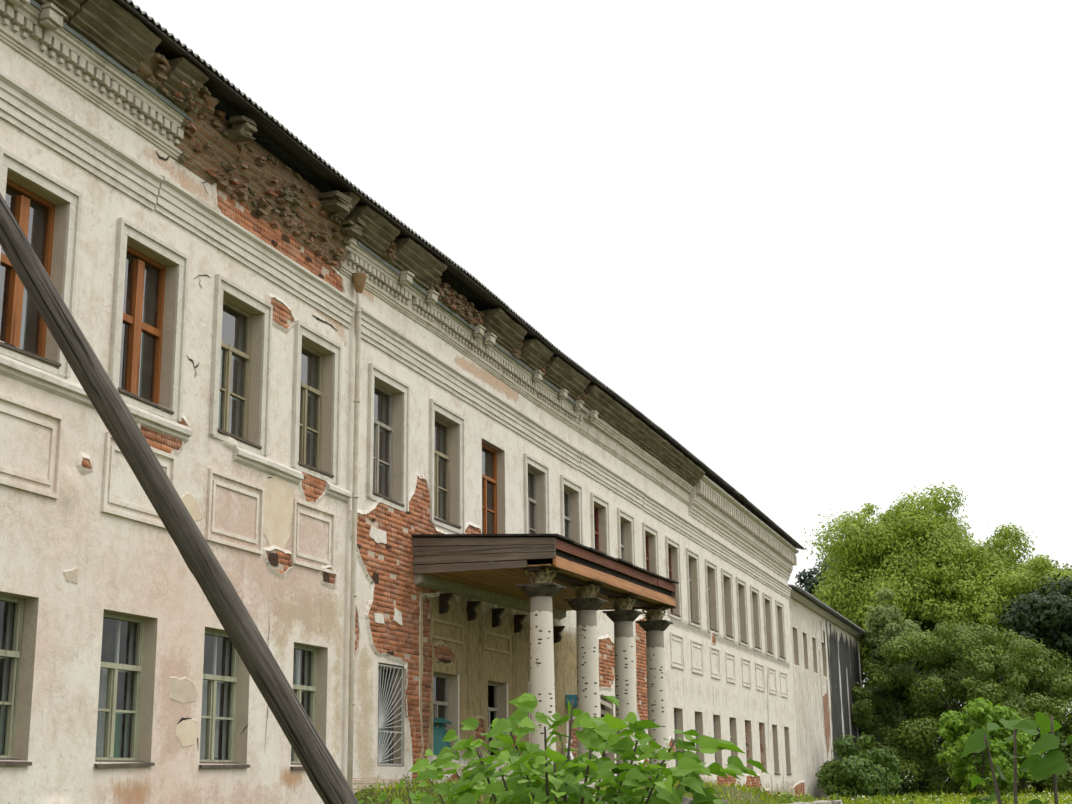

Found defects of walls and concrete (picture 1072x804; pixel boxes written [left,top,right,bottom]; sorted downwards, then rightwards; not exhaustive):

spalling [135,52,352,294]
flaking render [267,293,296,334]
flaking render [143,403,190,428]
flaking render [137,423,184,460]
peeling [263,465,328,580]
flaking render [465,521,482,534]
flaking render [319,564,337,590]
flaking render [348,472,467,787]
flaking render [598,634,615,691]
flaking render [699,773,770,794]